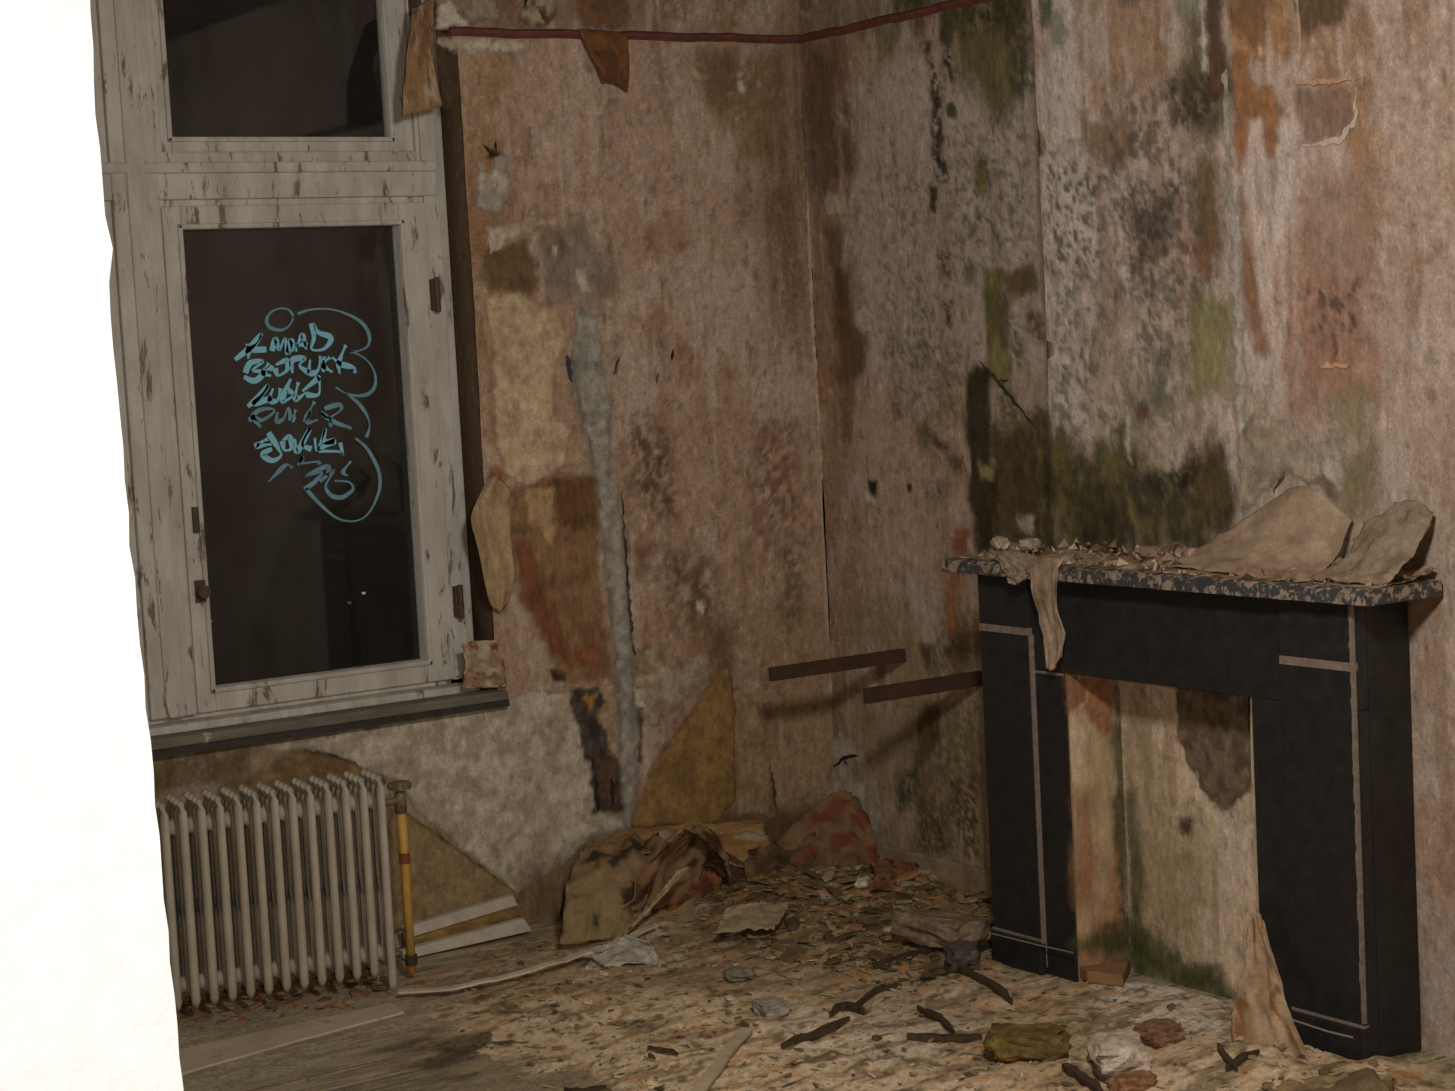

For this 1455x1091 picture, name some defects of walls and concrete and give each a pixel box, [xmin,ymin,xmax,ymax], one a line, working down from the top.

flaking render [1295,0,1358,147]
peeling [487,216,548,254]
damp [917,0,1268,554]
flaking render [252,306,709,896]
damp [1073,712,1234,1000]